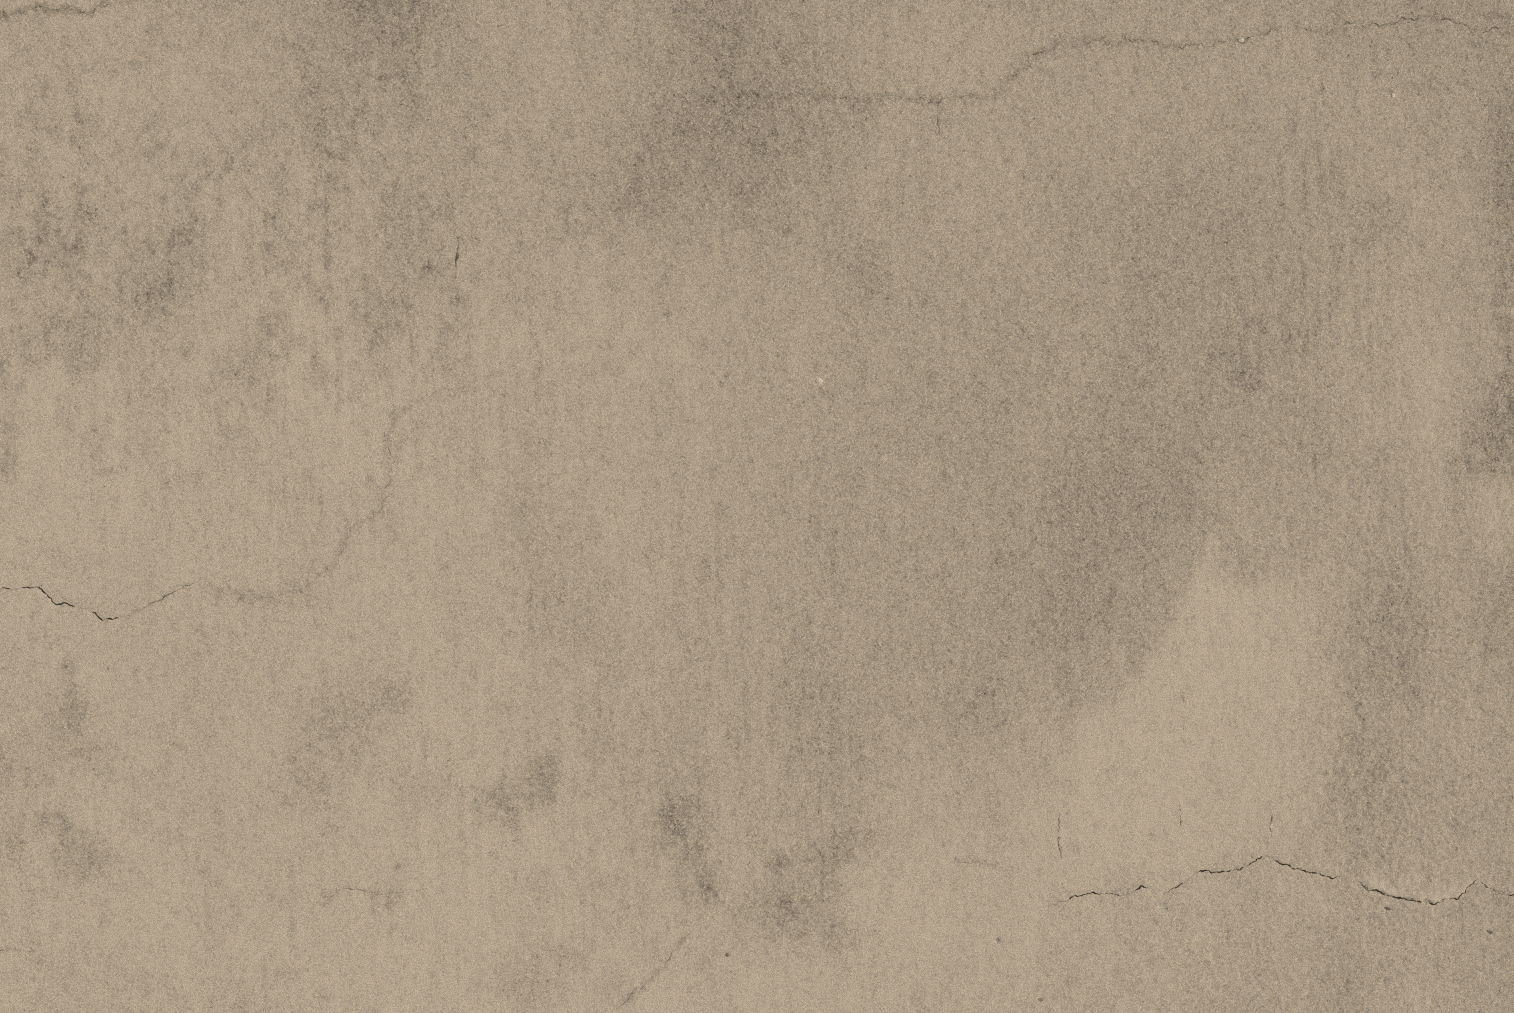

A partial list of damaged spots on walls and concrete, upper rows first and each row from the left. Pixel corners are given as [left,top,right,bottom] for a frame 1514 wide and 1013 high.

crack [679,10,1514,136]
crack [1,384,456,621]
crack [1047,800,1514,917]